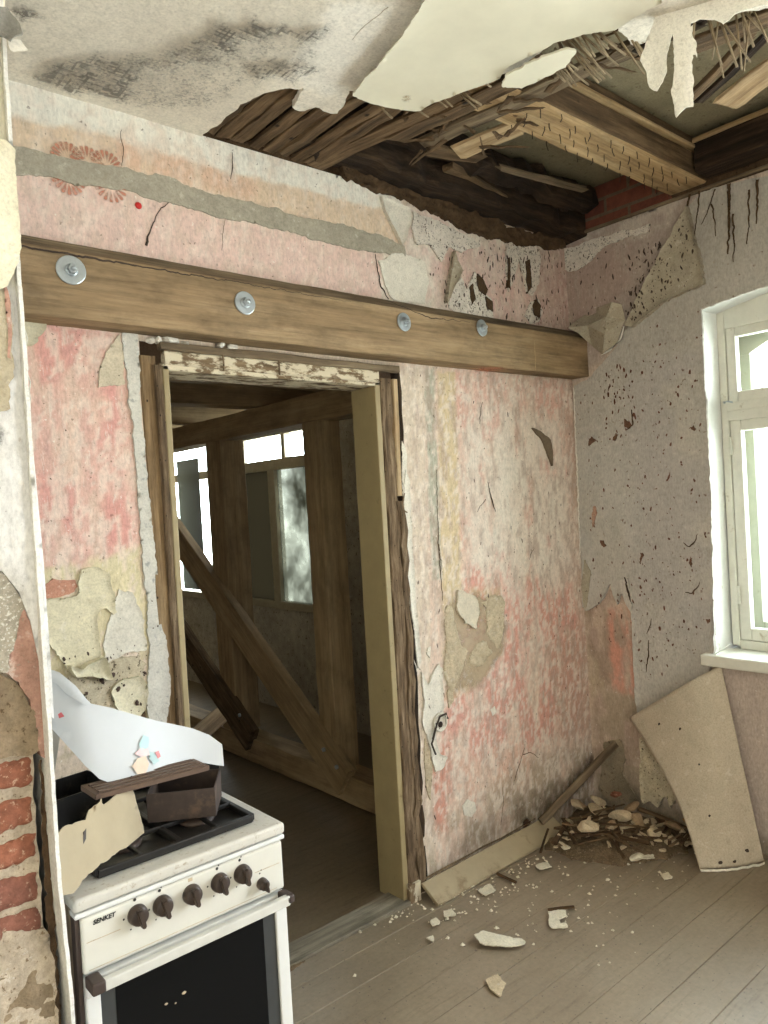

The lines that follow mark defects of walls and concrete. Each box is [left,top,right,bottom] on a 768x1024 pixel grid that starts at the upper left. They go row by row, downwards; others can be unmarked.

mould [32,20,329,106]
crack [21,202,342,301]
flaking render [0,0,662,324]
flaking render [0,256,149,1024]
spalling [401,441,505,800]